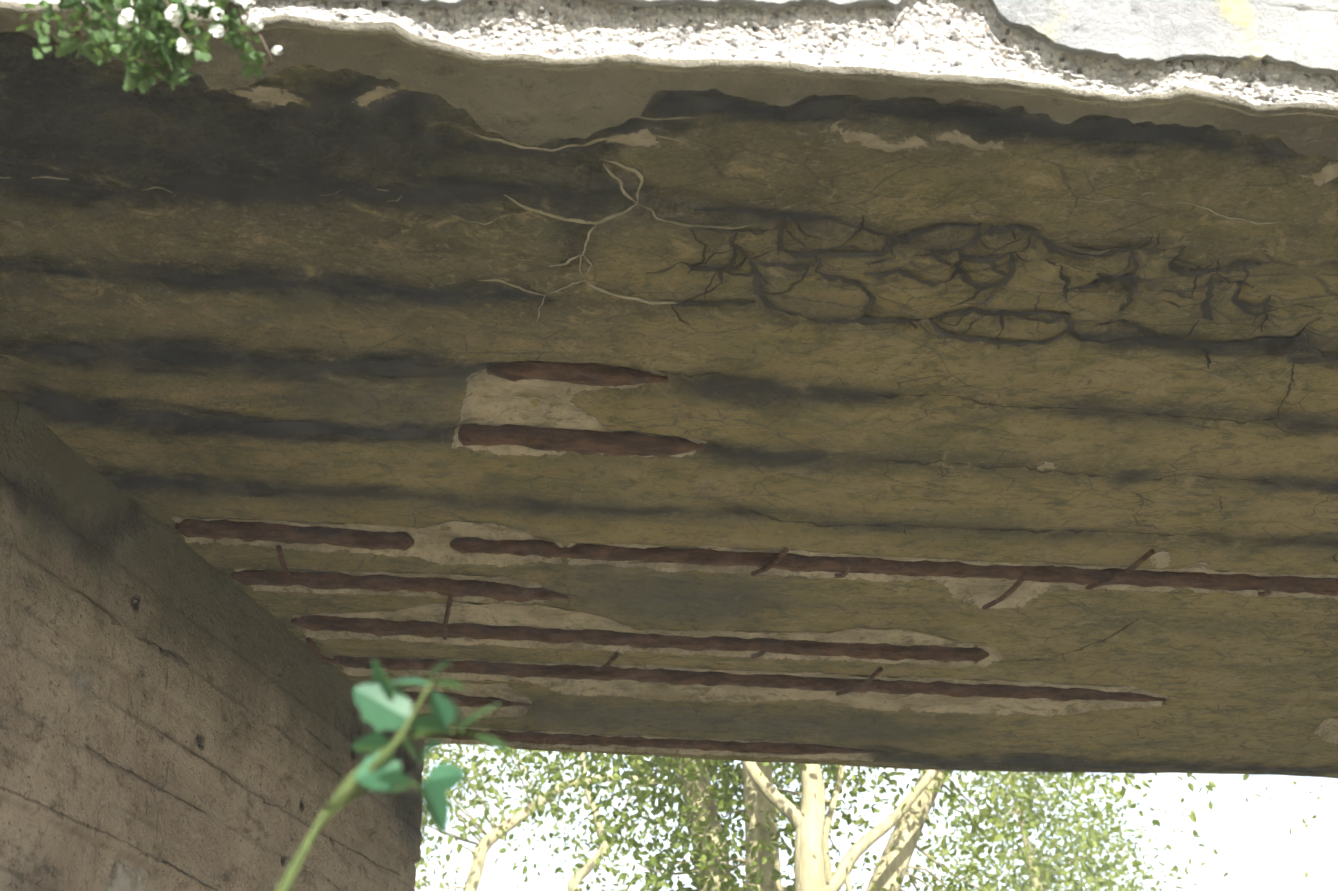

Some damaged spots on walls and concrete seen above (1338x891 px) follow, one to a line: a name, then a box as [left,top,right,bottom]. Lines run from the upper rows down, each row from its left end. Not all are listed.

flaking render [0,0,159,66]
damp [0,32,1306,225]
flaking render [175,0,1338,187]
crack [479,159,1338,424]
damp [11,384,458,443]
damp [1,335,489,382]
rust [487,361,668,386]
spalling [450,363,708,458]
rust [458,424,702,457]
rust [175,519,1166,702]
spalling [171,516,1338,762]
rust [450,537,1338,610]